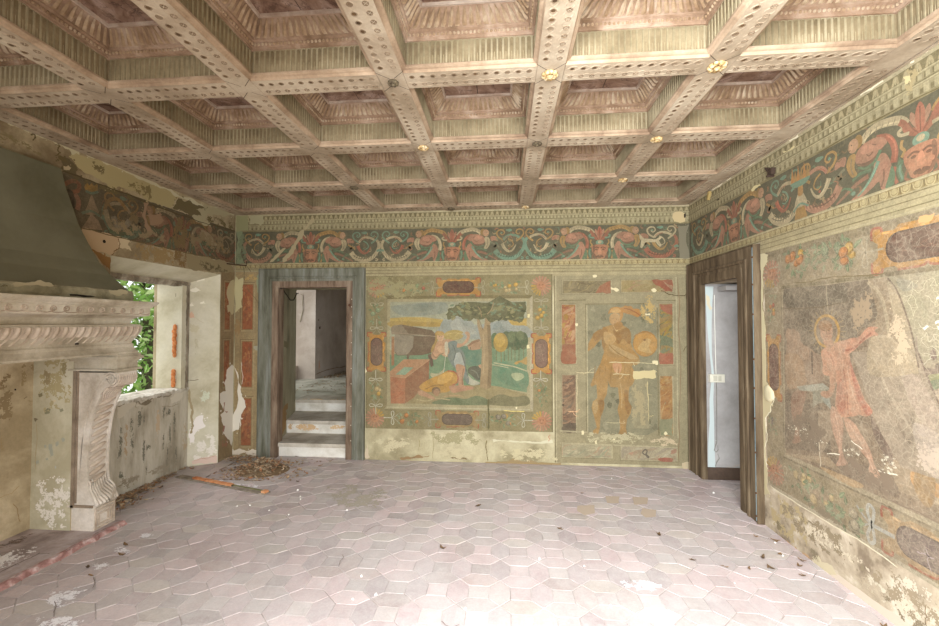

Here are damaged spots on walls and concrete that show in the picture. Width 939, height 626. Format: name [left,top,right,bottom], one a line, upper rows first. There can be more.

peeling [9,124,235,314]
crack [762,256,884,331]
flaking render [188,413,208,445]
flaking render [220,363,256,456]
crack [764,397,939,626]
peeling [812,556,911,626]